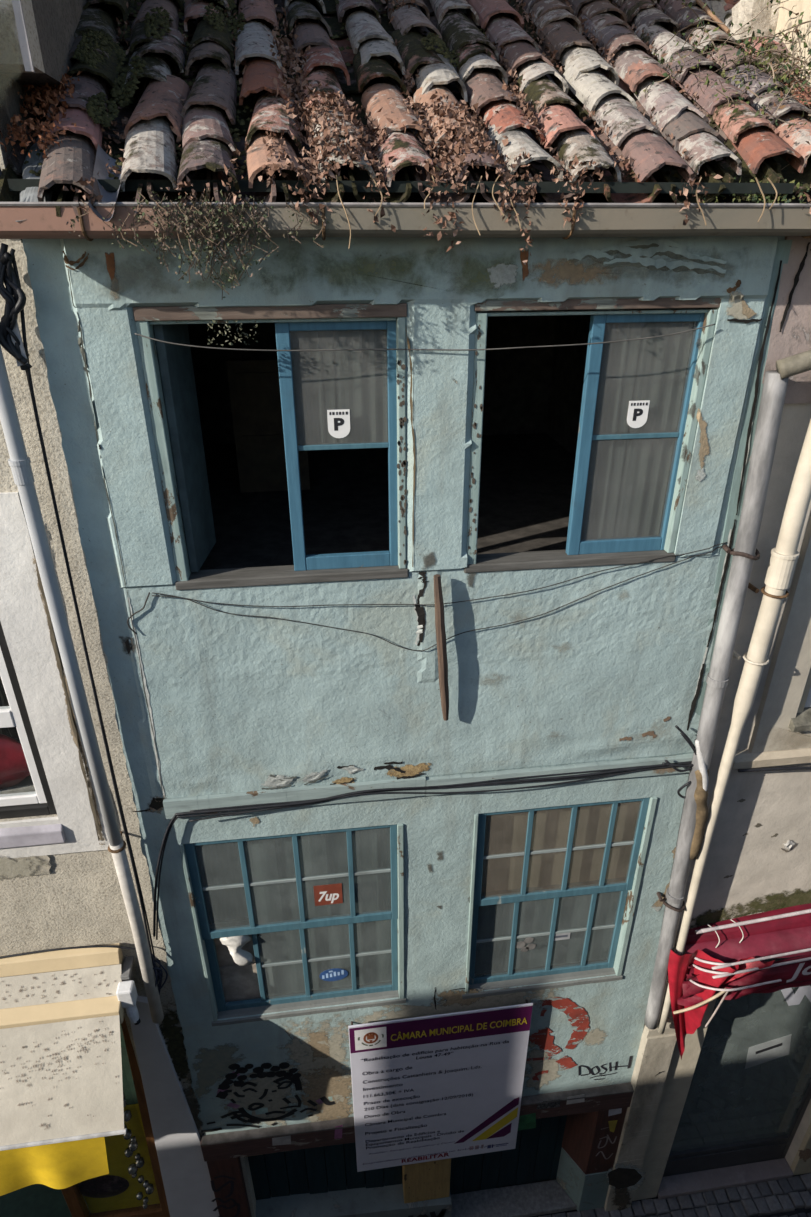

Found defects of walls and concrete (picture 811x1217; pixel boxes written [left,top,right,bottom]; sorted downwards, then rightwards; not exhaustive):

peeling [397,329,416,567]
crack [687,242,811,731]
crack [413,571,428,646]
flaking render [262,761,431,790]
peeling [193,986,564,1126]